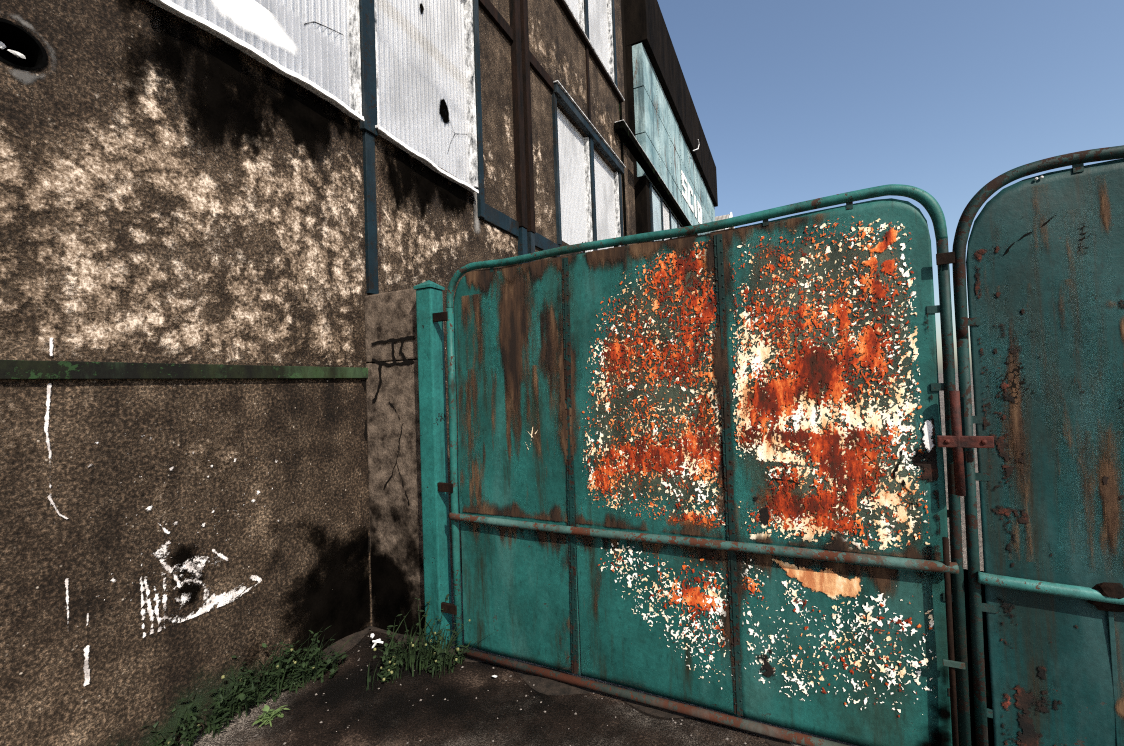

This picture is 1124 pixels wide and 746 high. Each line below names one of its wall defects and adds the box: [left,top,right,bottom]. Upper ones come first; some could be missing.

damp [383,148,480,231]
rust [974,246,1000,310]
rust [459,214,942,694]
rust [978,324,1031,567]
damp [271,505,425,675]
peeling [601,542,733,689]
peeling [742,559,936,715]
rust [1001,666,1062,746]
rust [1116,698,1124,717]